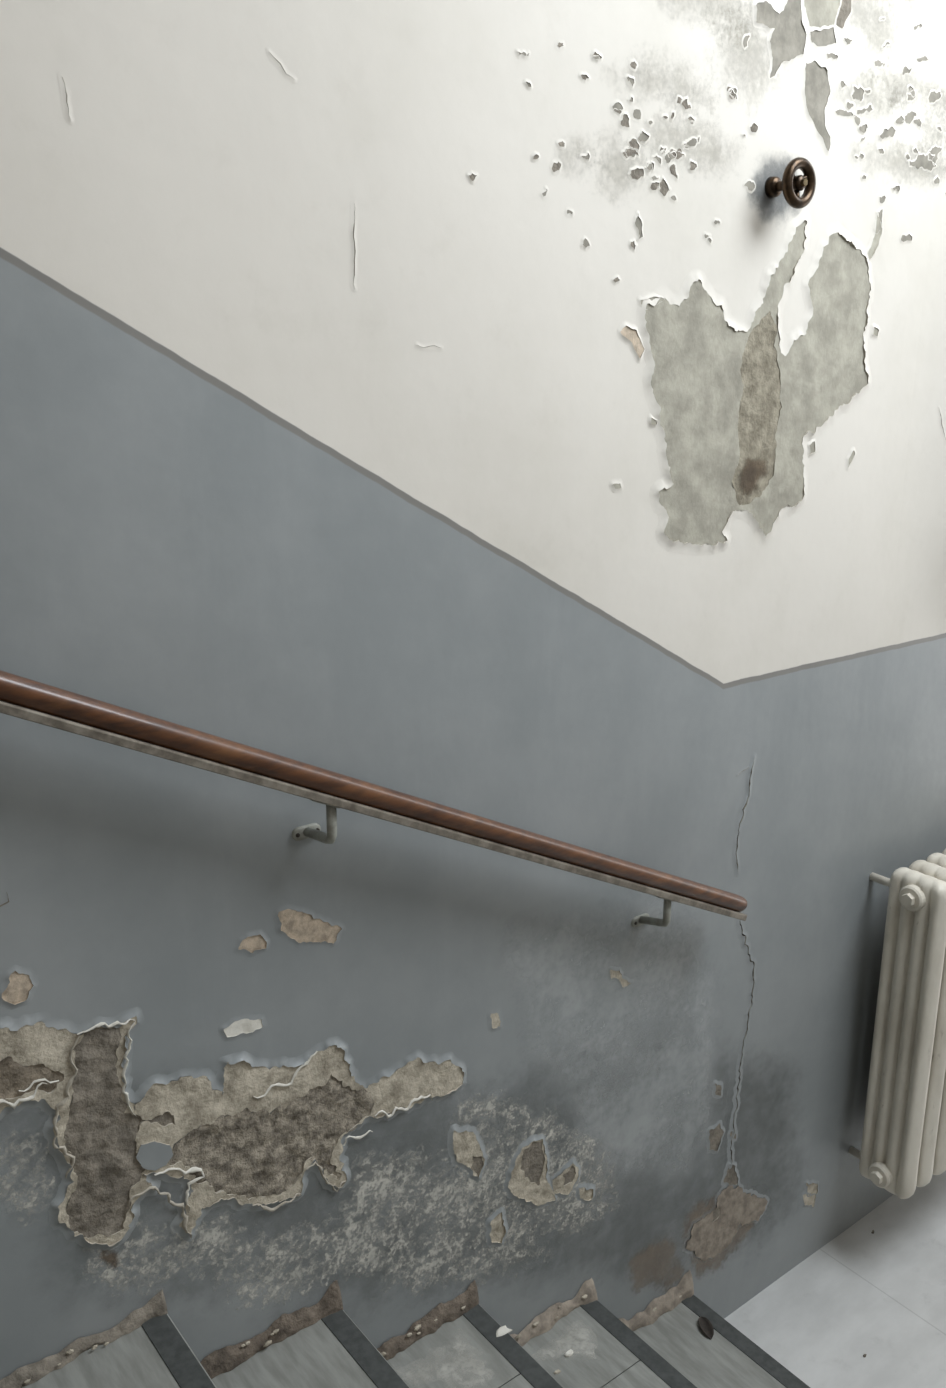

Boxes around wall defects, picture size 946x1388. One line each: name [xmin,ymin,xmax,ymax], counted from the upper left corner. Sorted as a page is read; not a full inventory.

peeling [751,0,854,157]
peeling [617,209,884,556]
crack [732,752,758,877]
spalling [233,903,346,957]
crack [726,912,758,1169]
spalling [0,965,467,1251]
water stain [88,909,706,1307]
spalling [484,1133,596,1248]
peeling [0,1289,168,1388]
peeling [200,1280,343,1379]
peeling [377,1280,479,1360]
peeling [496,1278,598,1346]